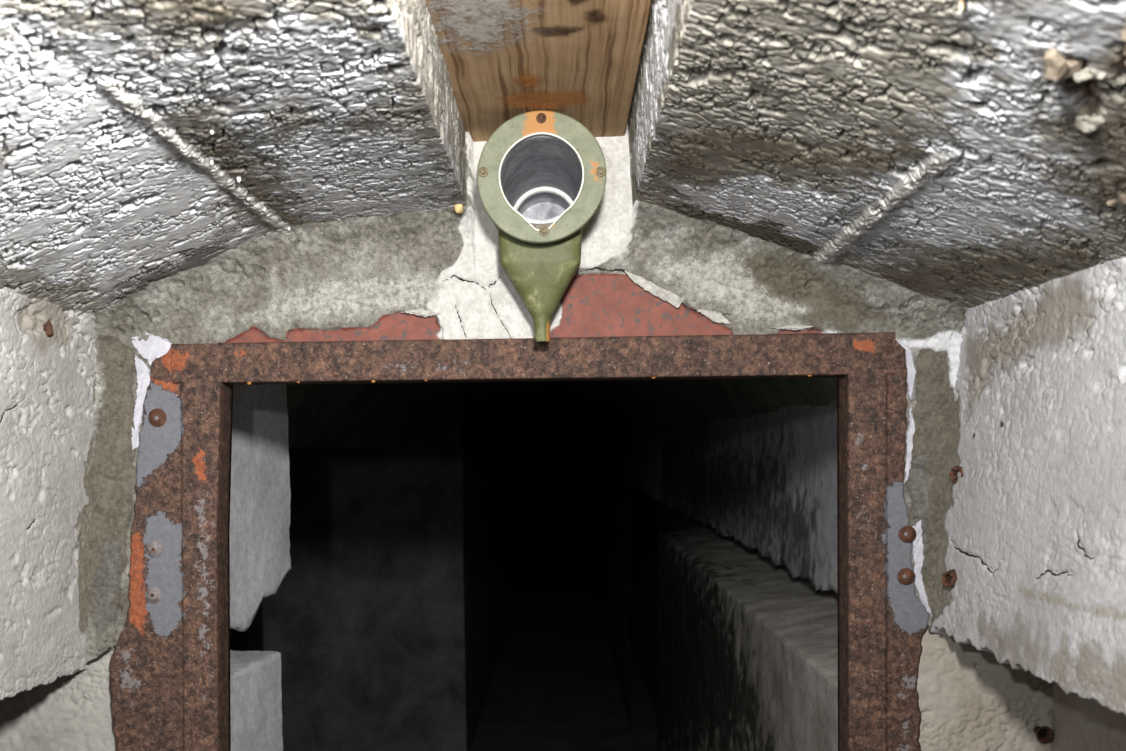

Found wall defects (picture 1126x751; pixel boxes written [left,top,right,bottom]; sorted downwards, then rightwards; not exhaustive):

spalling [1068,43,1126,133]
spalling [224,308,441,343]
crack [446,275,511,338]
spalling [550,270,733,338]
spalling [772,324,825,334]
peeling [130,332,172,450]
crack [951,540,997,573]
crack [1036,533,1093,579]